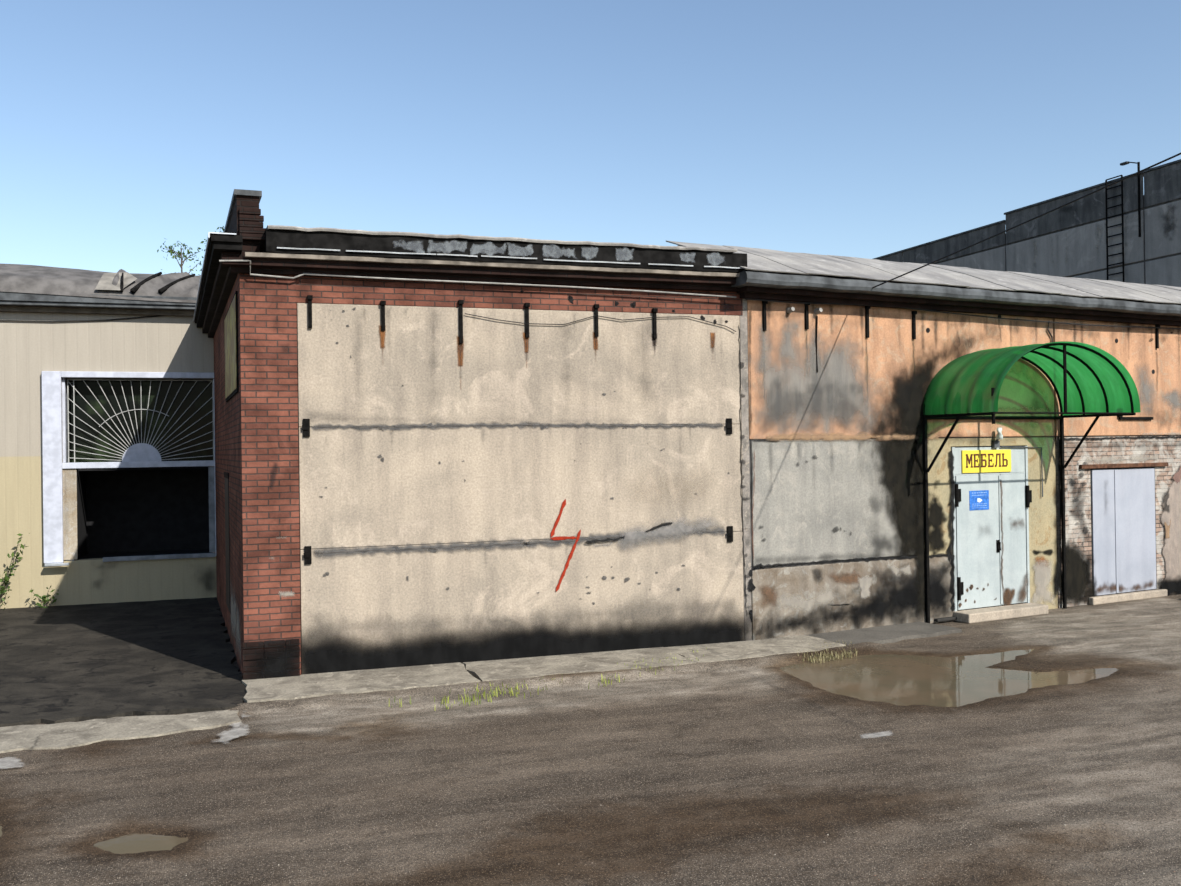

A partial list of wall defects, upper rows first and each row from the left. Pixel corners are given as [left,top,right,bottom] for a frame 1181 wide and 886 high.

damp [256,344,964,679]
flaking render [1161,467,1181,580]